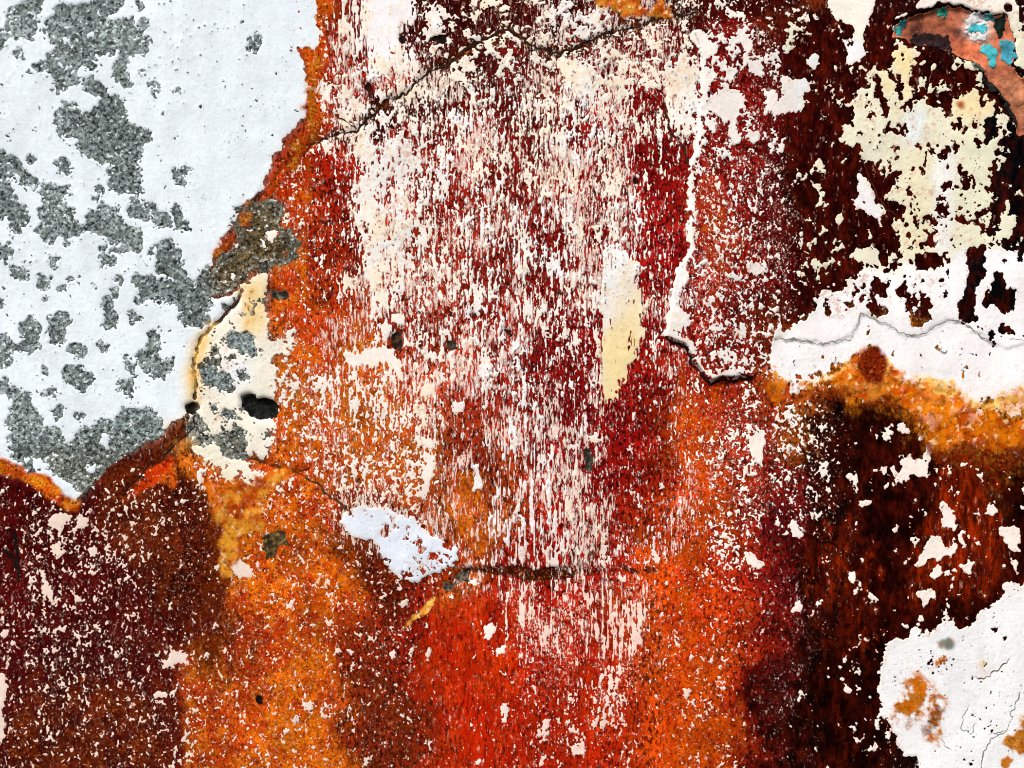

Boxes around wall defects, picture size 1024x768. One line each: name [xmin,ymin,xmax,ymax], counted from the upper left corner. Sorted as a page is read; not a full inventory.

crack [257,9,700,201]
corrosion [180,0,437,768]
crack [665,337,753,386]
corrosion [0,458,80,510]
peeling [623,482,664,510]
corrosion [764,346,1024,602]
peeling [166,548,222,623]
peeling [222,606,276,663]
peeling [768,580,823,630]
peeling [827,423,1024,768]
corrosion [892,671,945,742]
corrosion [1001,719,1024,768]